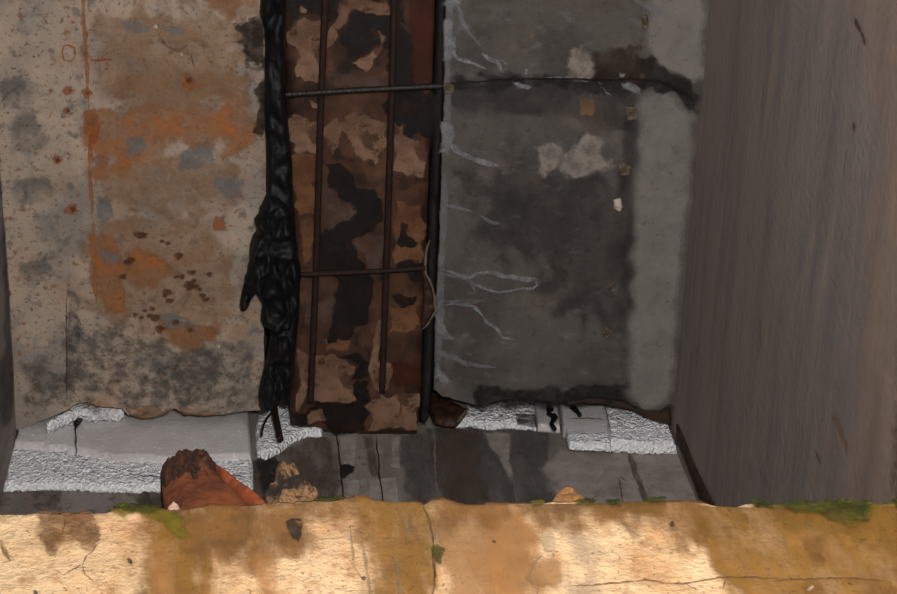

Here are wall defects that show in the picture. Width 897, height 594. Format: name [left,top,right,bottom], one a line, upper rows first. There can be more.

peeling [287,0,390,87]
crack [453,70,695,104]
peeling [288,112,427,269]
leakage [451,270,538,293]
leakage [0,350,14,423]
mould [25,312,249,411]
peeling [295,301,420,432]
leakage [137,353,897,594]
crack [571,576,881,590]